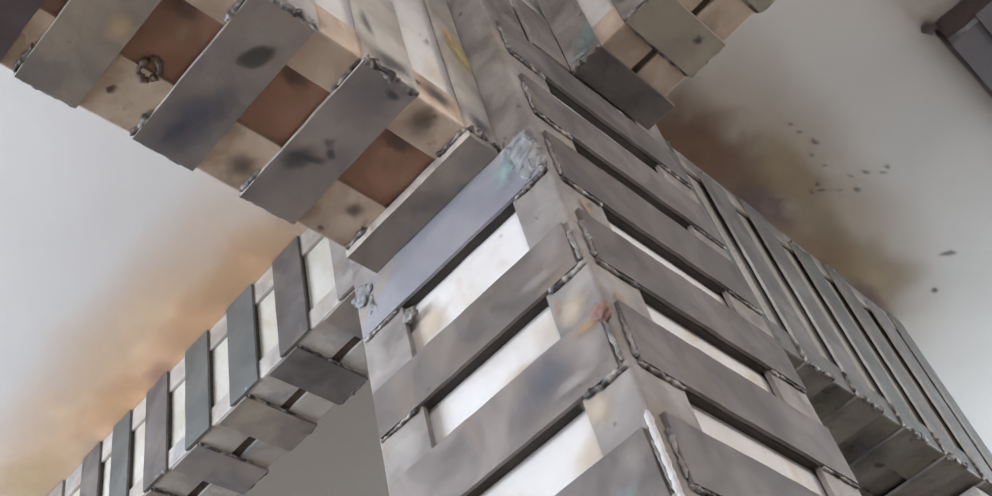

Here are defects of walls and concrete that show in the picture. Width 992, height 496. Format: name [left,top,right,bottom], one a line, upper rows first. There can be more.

damp [656,98,901,308]
damp [10,250,276,496]